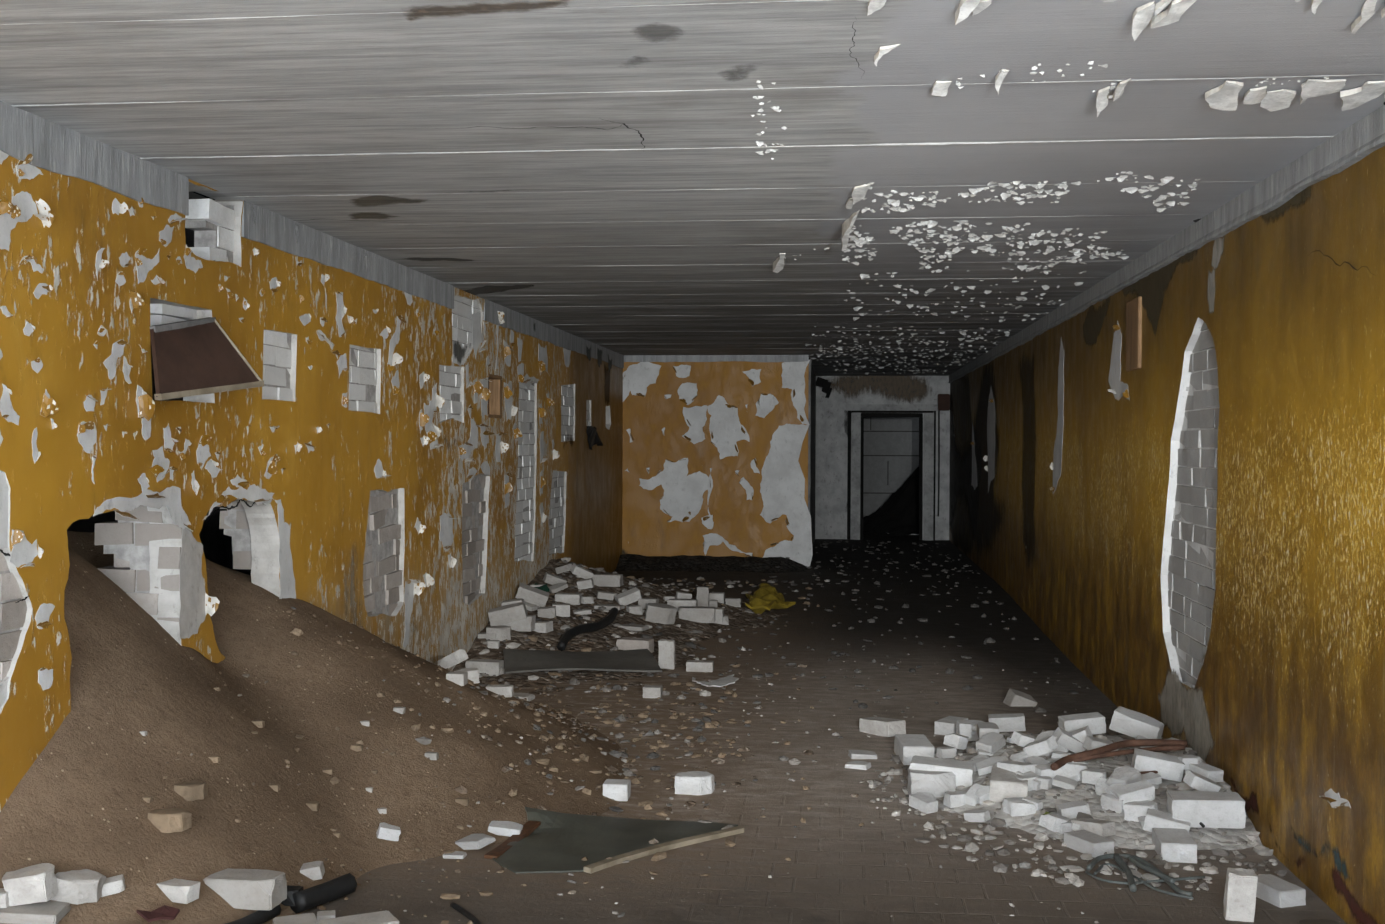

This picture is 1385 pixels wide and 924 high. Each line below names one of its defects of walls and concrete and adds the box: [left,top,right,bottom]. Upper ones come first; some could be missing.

peeling [1132,0,1197,41]
peeling [1030,61,1131,117]
peeling [1205,77,1385,111]
peeling [0,151,53,299]
spalling [95,197,281,323]
peeling [0,384,59,464]
spalling [77,325,330,639]
peeling [299,273,357,376]
peeling [373,292,420,395]
spalling [363,311,571,648]
spalling [622,171,1200,567]
spalling [0,471,55,710]